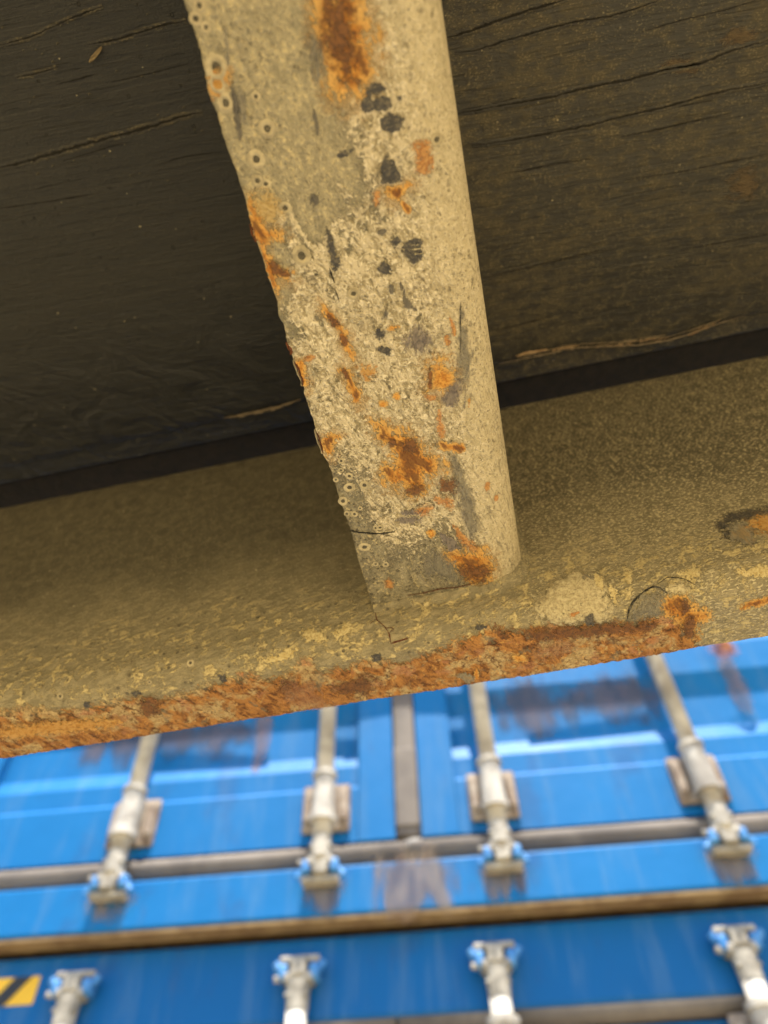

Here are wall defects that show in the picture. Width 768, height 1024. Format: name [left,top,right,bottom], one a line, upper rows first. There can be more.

corrosion [306,0,383,108]
corrosion [247,188,295,295]
corrosion [369,318,466,516]
corrosion [0,593,713,758]
crack [370,612,408,644]
corrosion [443,525,498,585]
crack [627,577,695,619]
peeling [714,506,768,548]